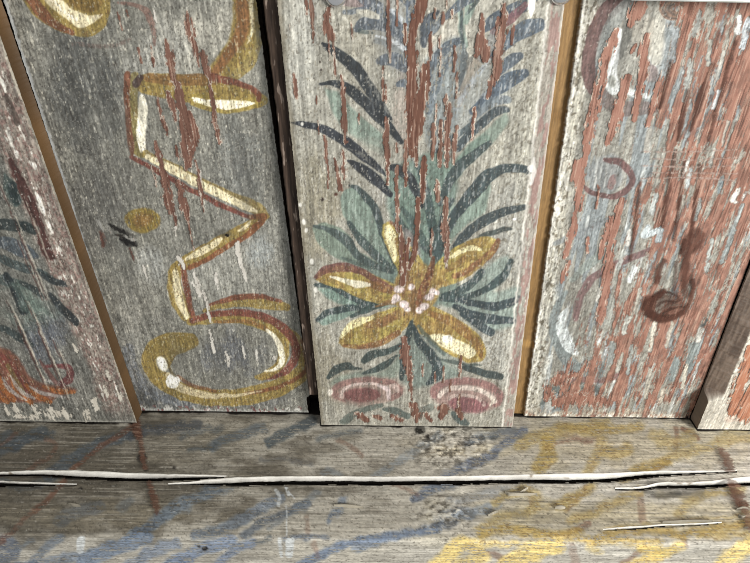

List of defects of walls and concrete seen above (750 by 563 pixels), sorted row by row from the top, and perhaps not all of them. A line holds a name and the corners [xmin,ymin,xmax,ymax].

peeling [151,140,195,251]
peeling [156,38,205,212]
peeling [183,10,223,145]
peeling [176,254,230,367]
peeling [225,234,247,282]
peeling [304,0,348,192]
peeling [382,0,459,287]
peeling [474,3,515,100]
peeling [542,1,750,425]
crack [0,470,750,491]
crack [603,522,722,531]